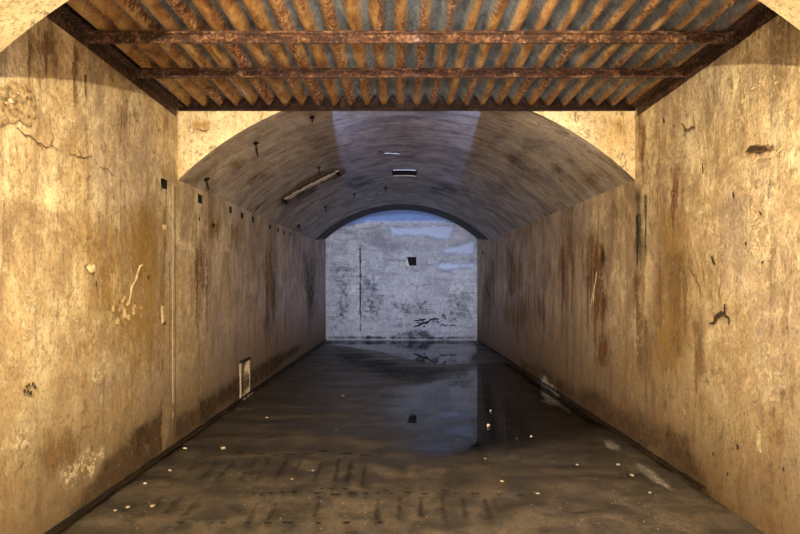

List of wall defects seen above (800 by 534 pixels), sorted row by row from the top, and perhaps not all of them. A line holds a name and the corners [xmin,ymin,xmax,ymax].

crack [17,128,115,176]
water stain [636,193,647,266]
flaking render [112,264,150,327]
corrosion [587,237,607,362]
water stain [172,346,298,439]
water stain [42,417,162,521]